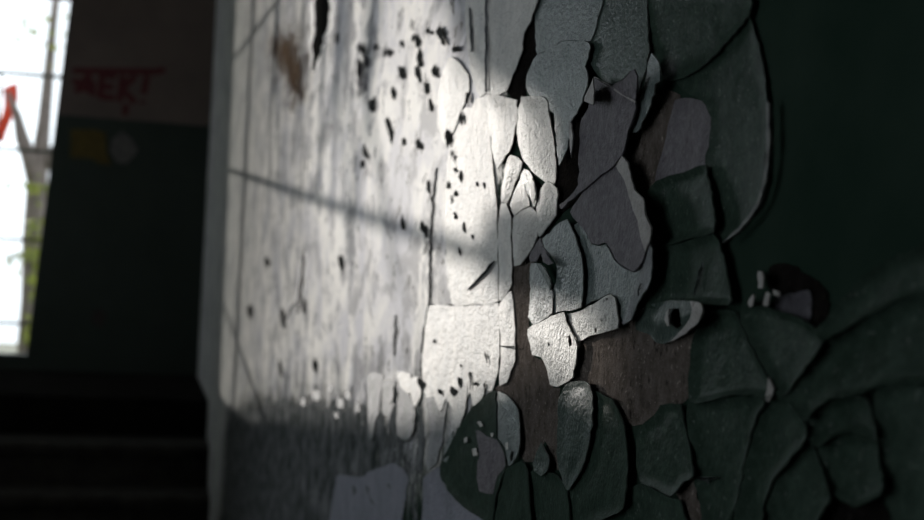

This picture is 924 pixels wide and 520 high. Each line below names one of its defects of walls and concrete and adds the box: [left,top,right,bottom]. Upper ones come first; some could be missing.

peeling [301,0,773,520]
spalling [748,263,831,328]
spalling [820,498,891,520]